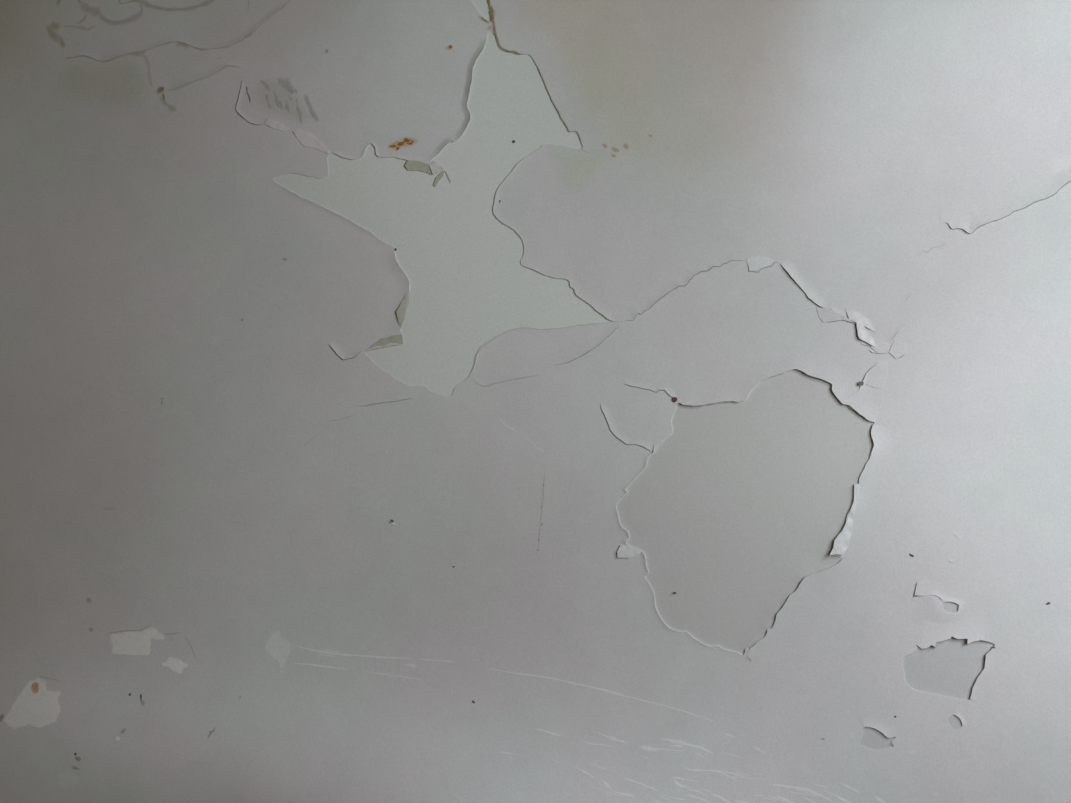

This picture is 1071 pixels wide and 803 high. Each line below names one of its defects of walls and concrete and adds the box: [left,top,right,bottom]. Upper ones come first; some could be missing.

corrosion [388,136,420,151]
peeling [264,0,623,397]
crack [937,166,1071,234]
peeling [611,346,895,662]
peeling [898,606,999,730]